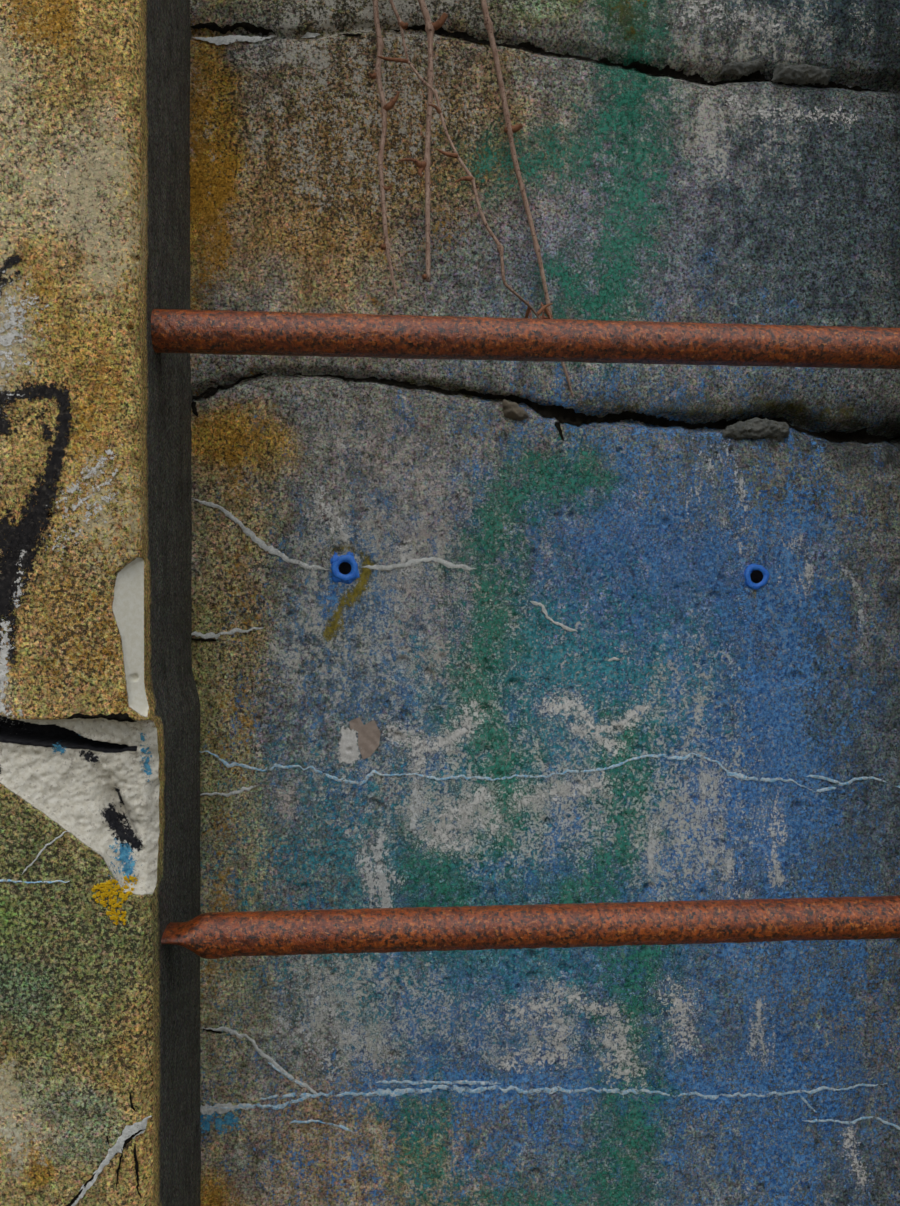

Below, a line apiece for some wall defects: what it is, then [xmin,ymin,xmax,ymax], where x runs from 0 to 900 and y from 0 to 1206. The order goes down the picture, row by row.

crack [191,22,887,92]
crack [191,373,900,444]
crack [192,498,330,571]
crack [364,557,476,571]
crack [0,713,137,753]
spalling [0,557,160,895]
crack [199,751,900,797]
crack [200,1027,900,1132]
crack [66,1093,152,1206]